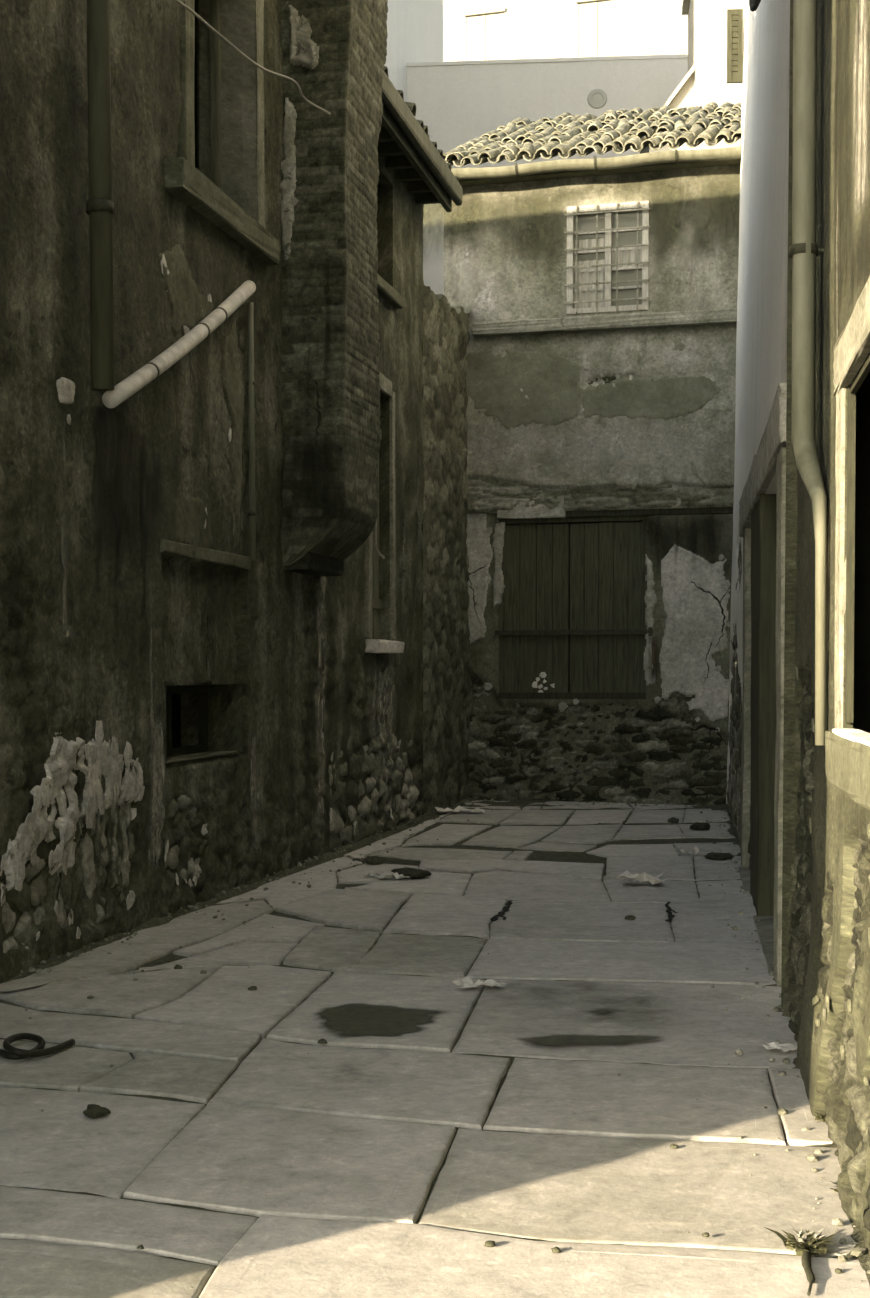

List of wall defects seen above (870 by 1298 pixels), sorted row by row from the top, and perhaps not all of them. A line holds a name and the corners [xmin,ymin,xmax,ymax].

flaking render [286,1,319,70]
flaking render [588,373,633,387]
flaking render [466,478,734,644]
flaking render [467,539,751,869]
crack [691,581,729,682]
flaking render [0,721,145,953]